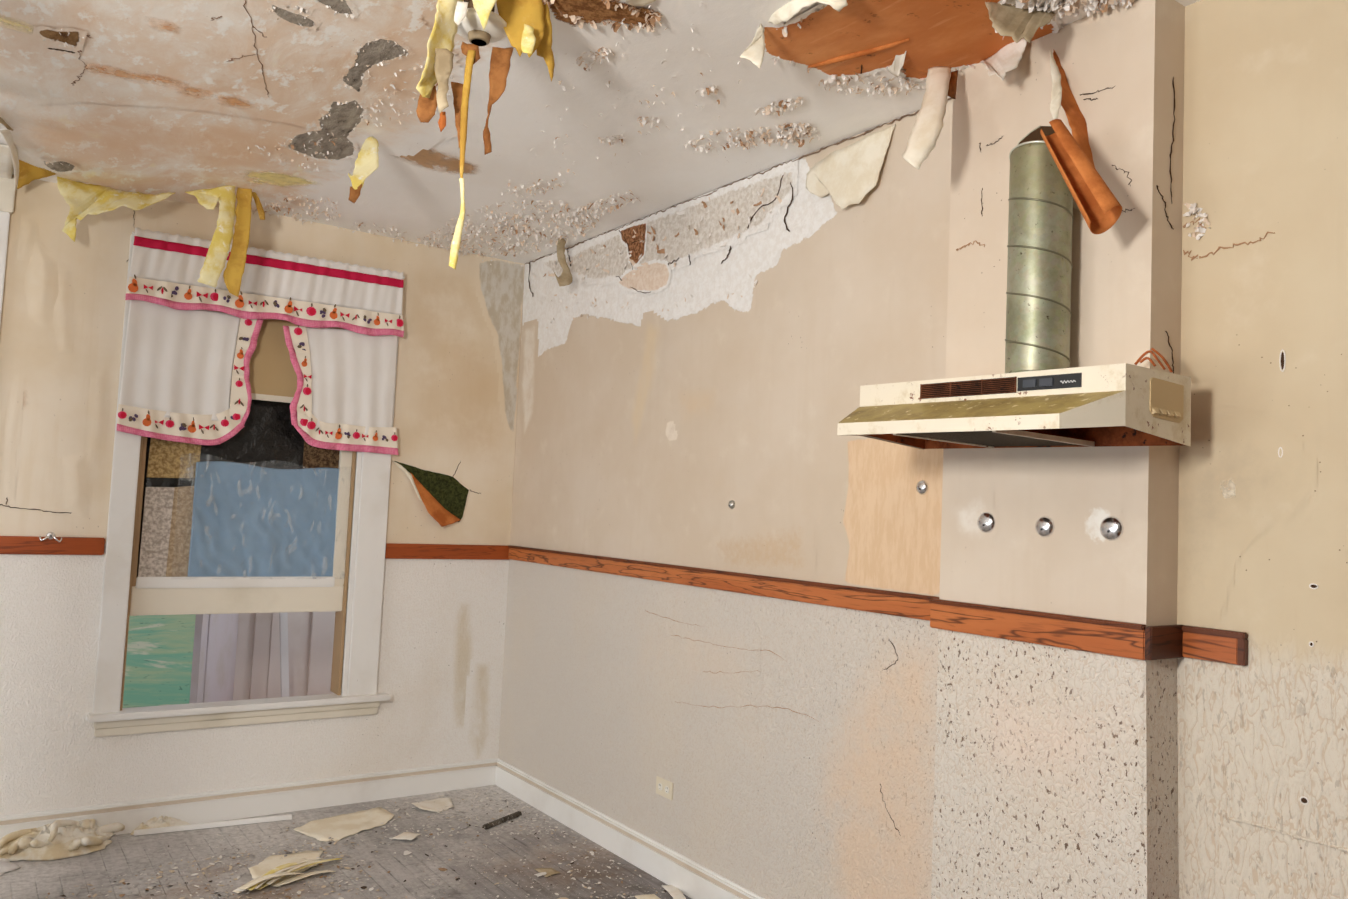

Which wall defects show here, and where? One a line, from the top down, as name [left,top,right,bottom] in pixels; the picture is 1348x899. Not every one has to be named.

peeling [33,26,87,50]
crack [211,0,269,97]
peeling [263,0,361,31]
peeling [542,0,667,71]
peeling [737,0,1134,170]
peeling [38,158,79,174]
peeling [246,24,842,377]
crack [1112,77,1275,261]
water stain [444,594,498,760]